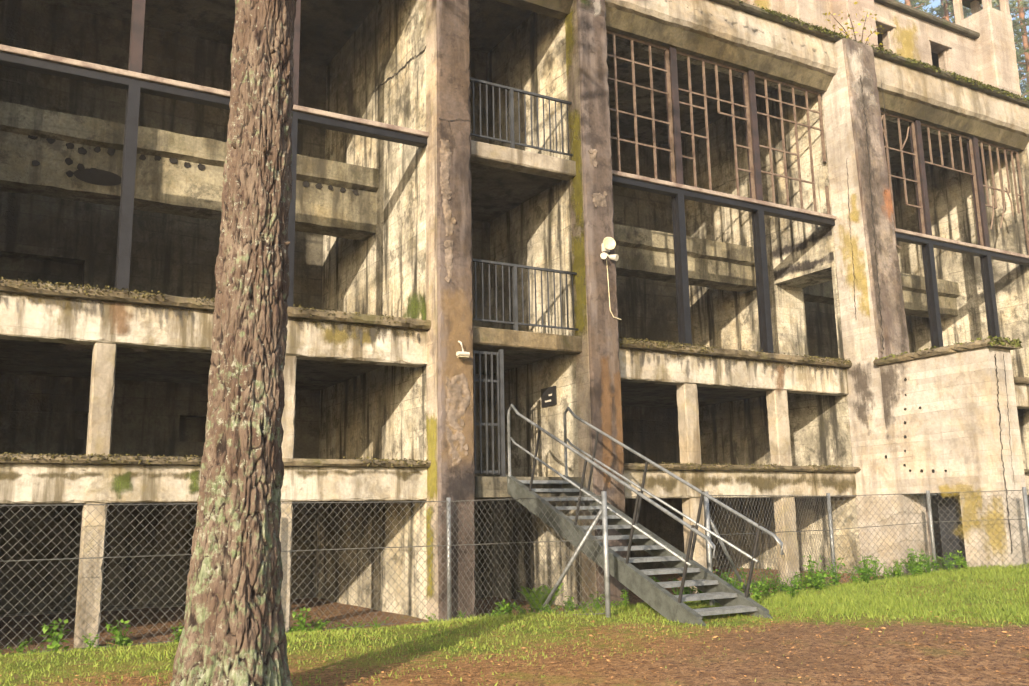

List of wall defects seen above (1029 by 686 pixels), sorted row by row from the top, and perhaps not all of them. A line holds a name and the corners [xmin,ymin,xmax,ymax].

leakage [772,227,834,280]
leakage [857,76,884,340]
spalling [445,373,471,466]
leakage [631,349,775,375]
leakage [793,255,907,425]
crack [994,354,1015,554]